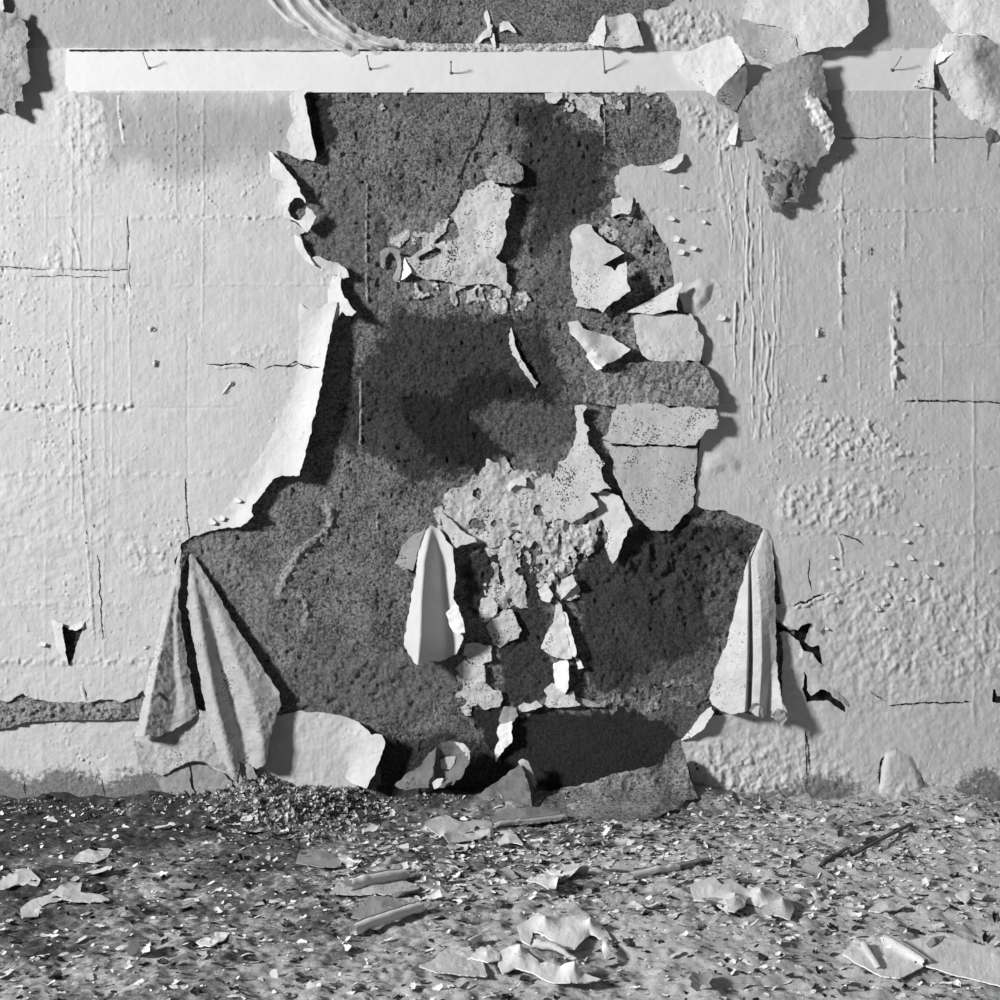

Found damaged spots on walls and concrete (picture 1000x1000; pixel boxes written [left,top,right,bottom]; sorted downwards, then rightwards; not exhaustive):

peeling [330,0,675,48]
peeling [914,0,1000,161]
peeling [674,0,869,213]
crack [842,133,986,141]
crack [0,219,131,289]
crack [204,361,318,372]
crack [905,397,1000,405]
peeling [134,85,829,800]
peeling [36,619,88,665]
crack [870,690,969,706]